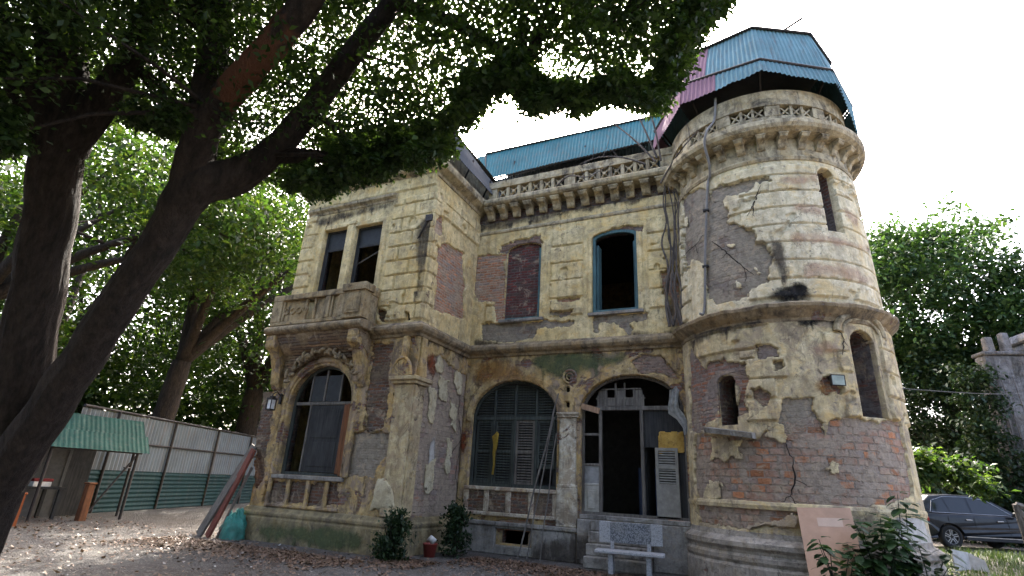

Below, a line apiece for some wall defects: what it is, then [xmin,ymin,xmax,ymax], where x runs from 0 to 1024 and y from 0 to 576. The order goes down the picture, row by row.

flaking render [253,343,394,506]
flaking render [412,355,466,517]
flaking render [433,217,581,343]
leakage [533,353,621,376]
flaking render [593,313,648,335]
flaking render [661,178,774,326]
flaking render [669,345,910,530]
leakage [771,241,809,302]
crack [781,443,807,504]